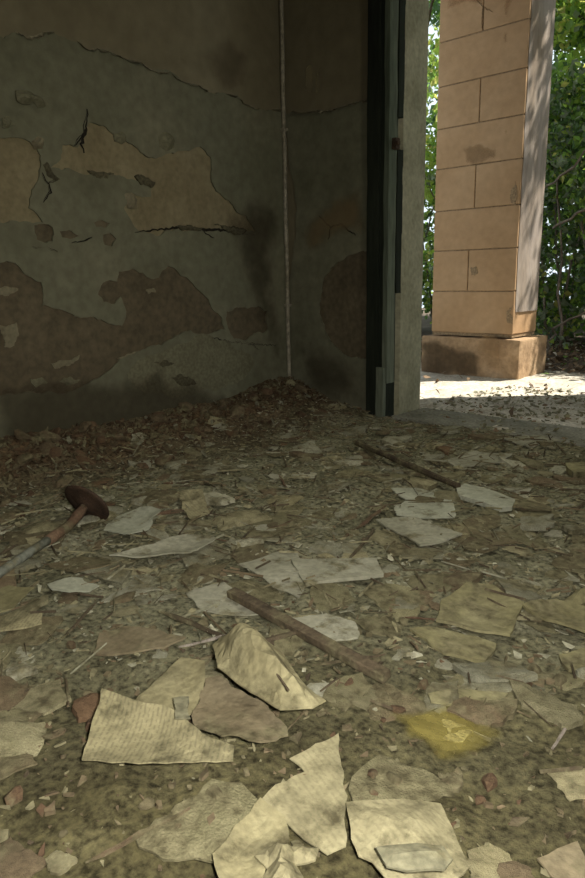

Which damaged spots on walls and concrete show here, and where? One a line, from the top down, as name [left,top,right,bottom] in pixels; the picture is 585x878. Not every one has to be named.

crack [75,109,89,153]
crack [42,172,55,201]
peeling [0,31,367,437]
crack [135,226,256,238]